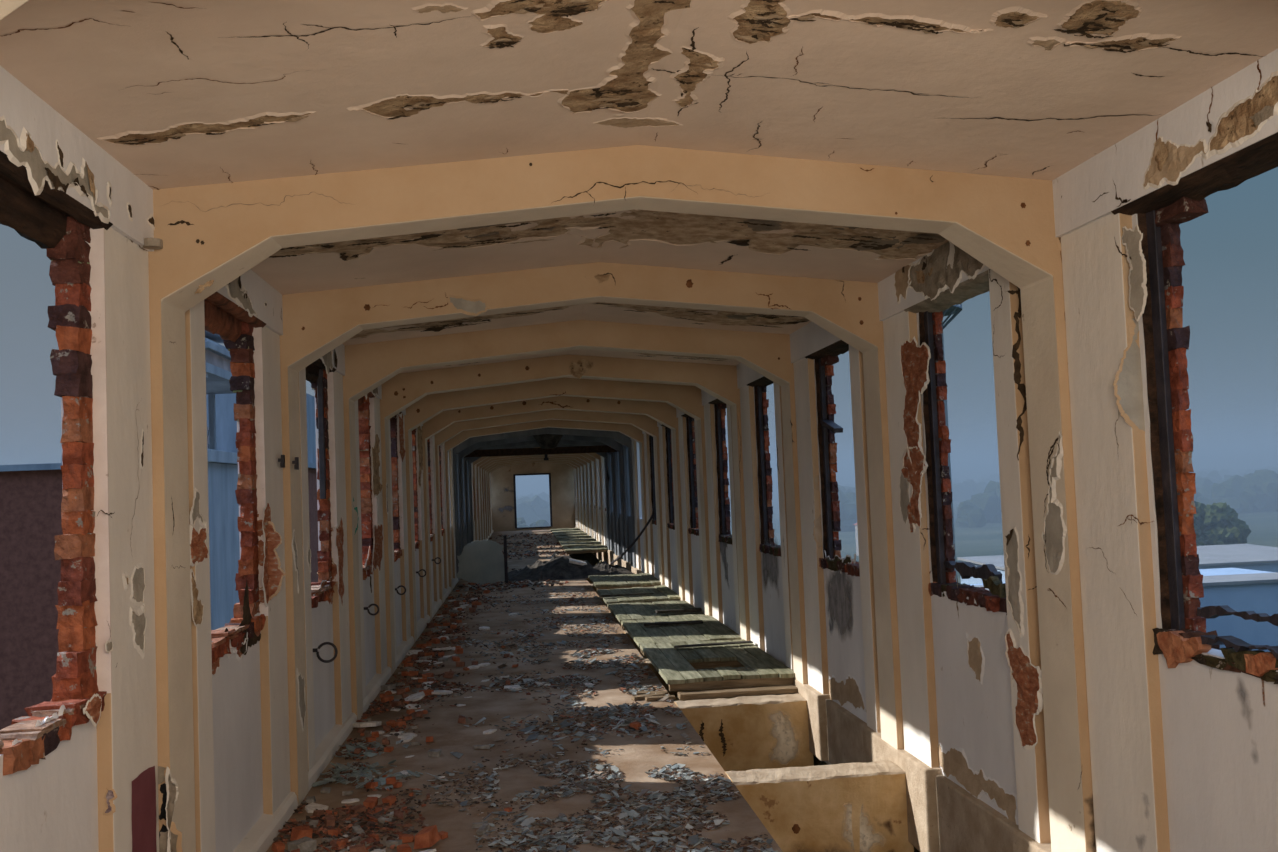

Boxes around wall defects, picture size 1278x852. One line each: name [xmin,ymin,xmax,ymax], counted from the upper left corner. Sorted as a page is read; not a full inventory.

crack [4,2,471,94]
flaking render [346,0,725,128]
flaking render [727,0,1182,53]
flaking render [0,115,110,224]
flaking render [97,111,317,146]
crack [443,180,936,251]
flaking render [1143,71,1278,190]
flaking render [1121,224,1148,322]
flaking render [899,336,931,535]
flaking render [1042,431,1067,575]
flaking render [122,563,146,659]
flaking render [1005,526,1043,750]